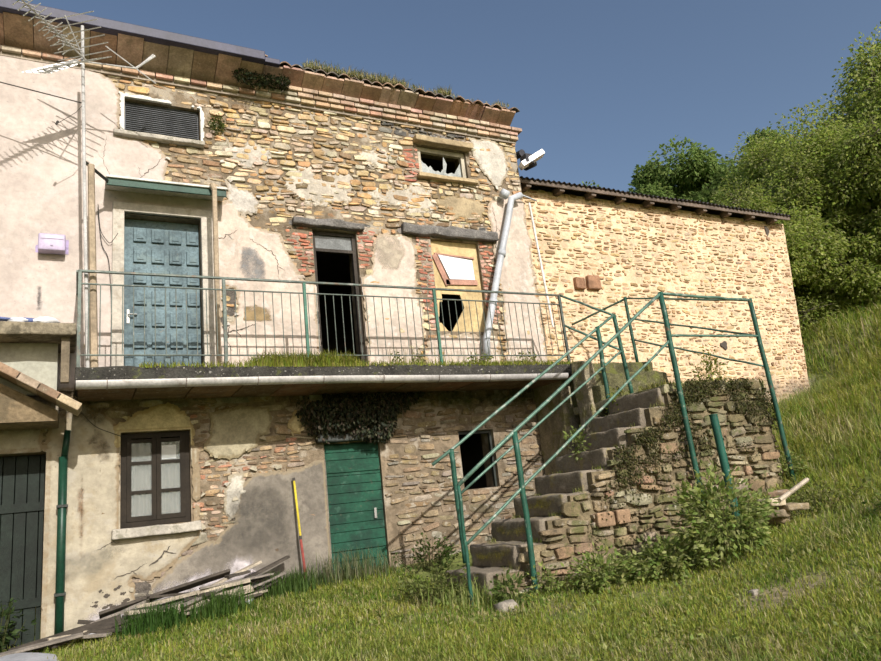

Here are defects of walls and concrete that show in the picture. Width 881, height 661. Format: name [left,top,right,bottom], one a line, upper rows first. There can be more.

crack [219,230,285,278]
flaking render [220,288,239,325]
peeling [113,402,309,538]
crack [116,545,175,578]